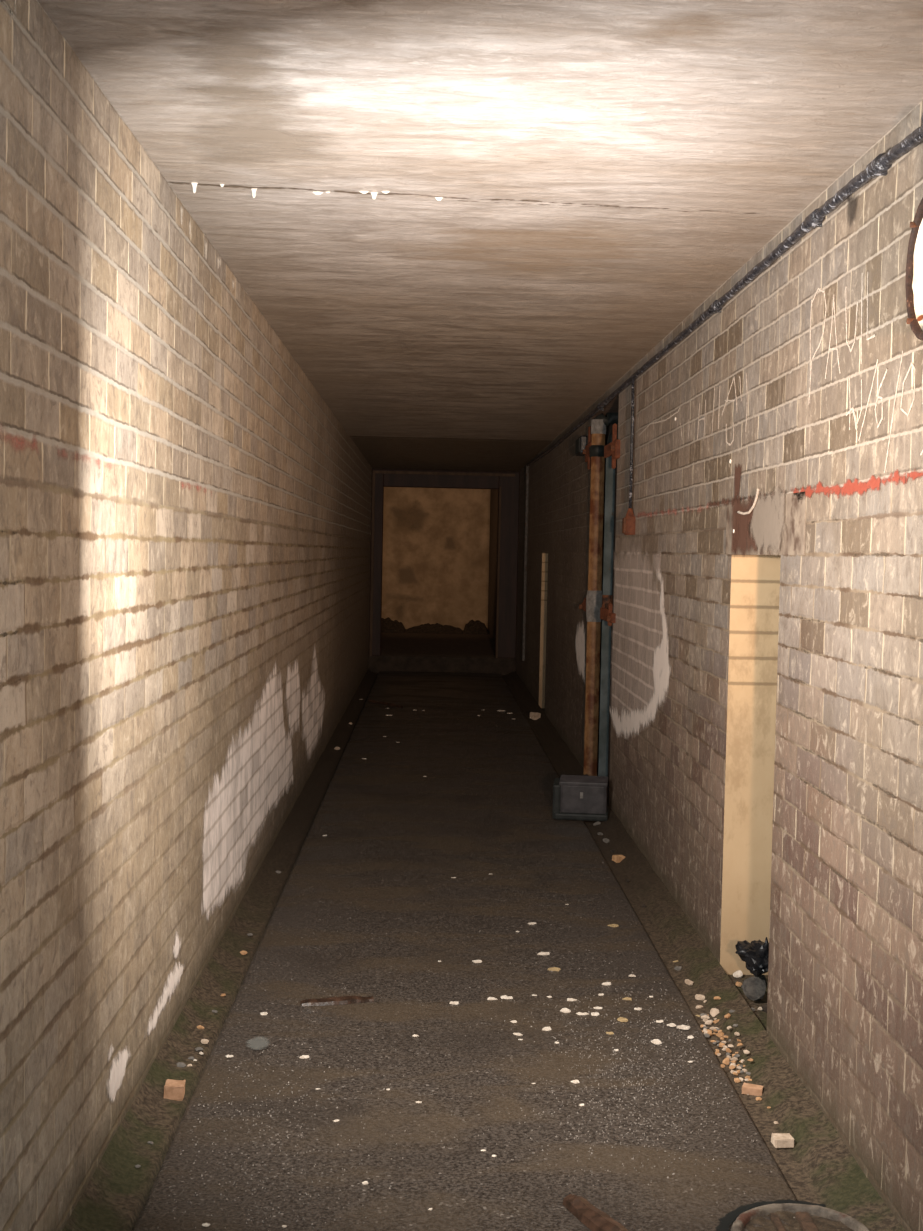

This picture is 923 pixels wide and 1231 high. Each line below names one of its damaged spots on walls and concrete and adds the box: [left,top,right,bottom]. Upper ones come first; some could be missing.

damp [575,622,585,680]
damp [610,552,671,736]
damp [203,644,325,919]